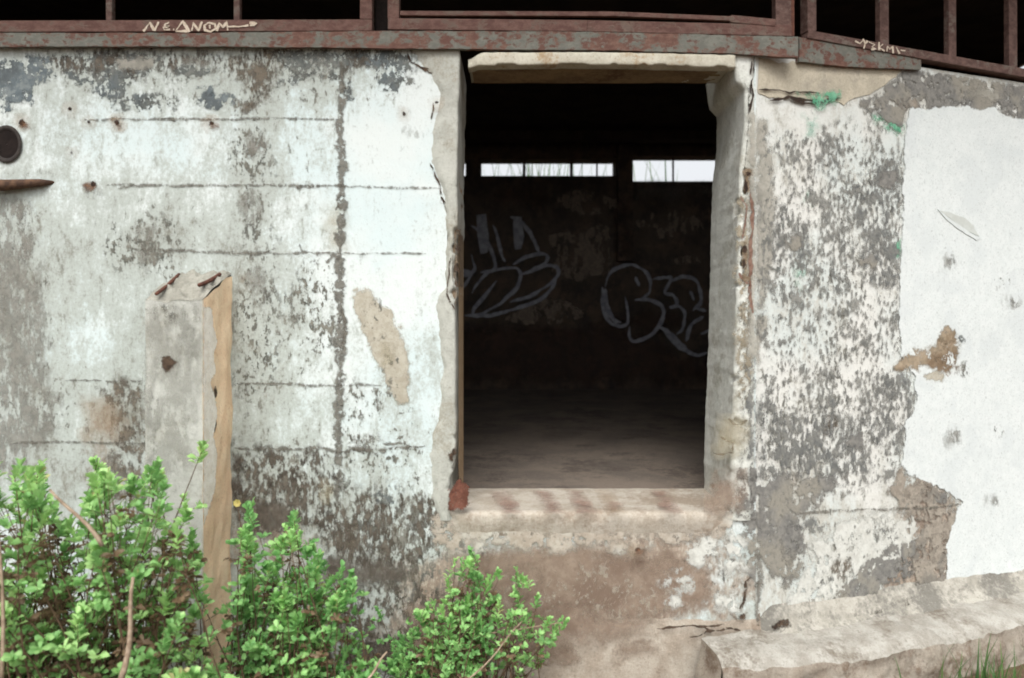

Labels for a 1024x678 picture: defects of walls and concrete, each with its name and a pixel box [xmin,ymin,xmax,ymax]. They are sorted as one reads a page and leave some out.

rust [161,356,177,372]
peeling [352,288,410,405]
peeling [500,70,1024,620]
rust [447,478,470,511]
leakage [231,385,742,674]
crack [657,548,764,638]